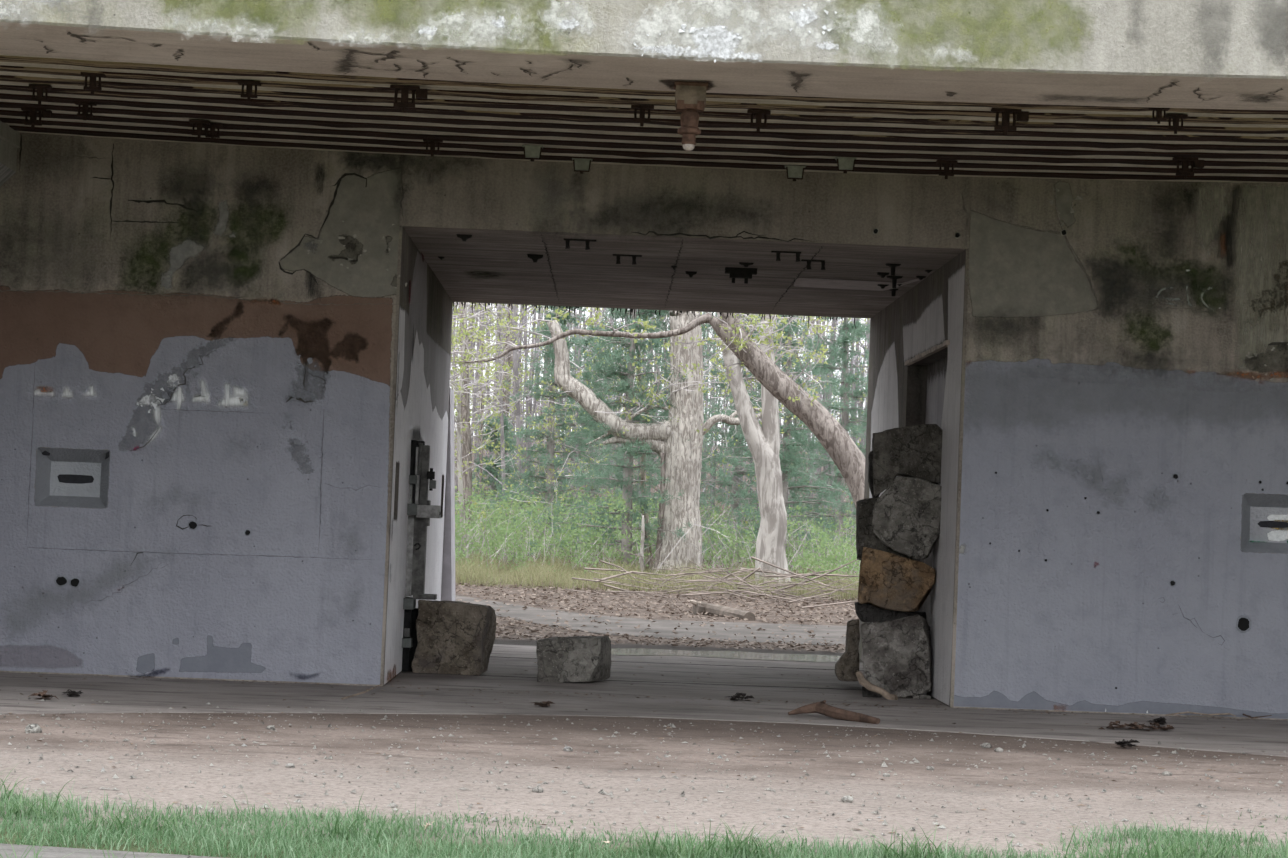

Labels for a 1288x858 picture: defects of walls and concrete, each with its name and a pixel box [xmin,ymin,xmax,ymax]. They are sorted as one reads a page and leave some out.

peeling [122,347,216,451]